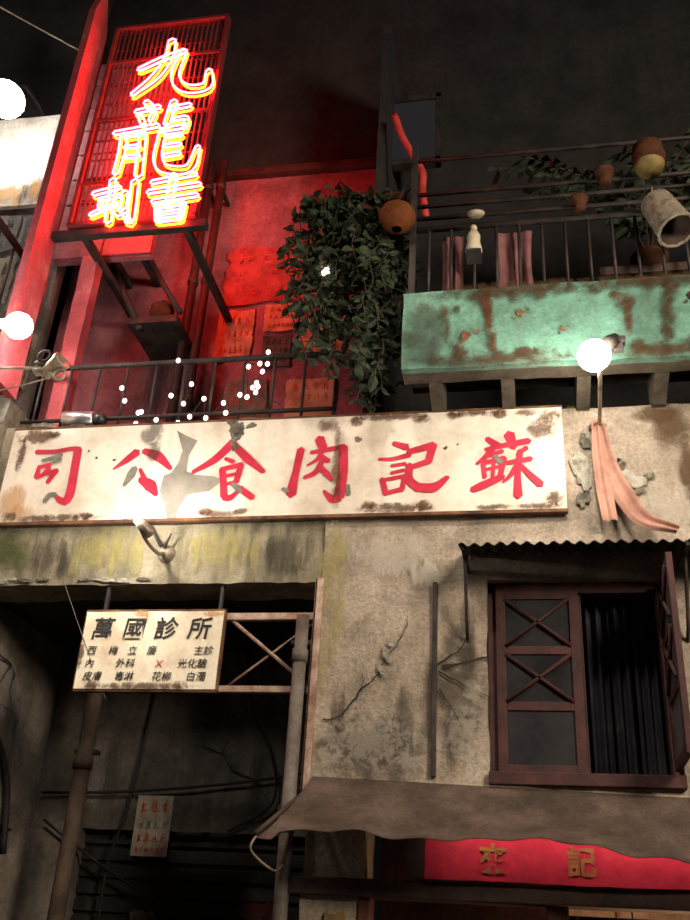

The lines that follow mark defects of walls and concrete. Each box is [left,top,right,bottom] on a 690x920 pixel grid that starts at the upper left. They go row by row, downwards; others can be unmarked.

corrosion [432,280,573,368]
corrosion [590,272,690,358]
flaking render [569,433,592,508]
spalling [617,458,654,495]
leakage [637,407,690,487]
crack [323,617,408,739]
crack [438,639,491,731]